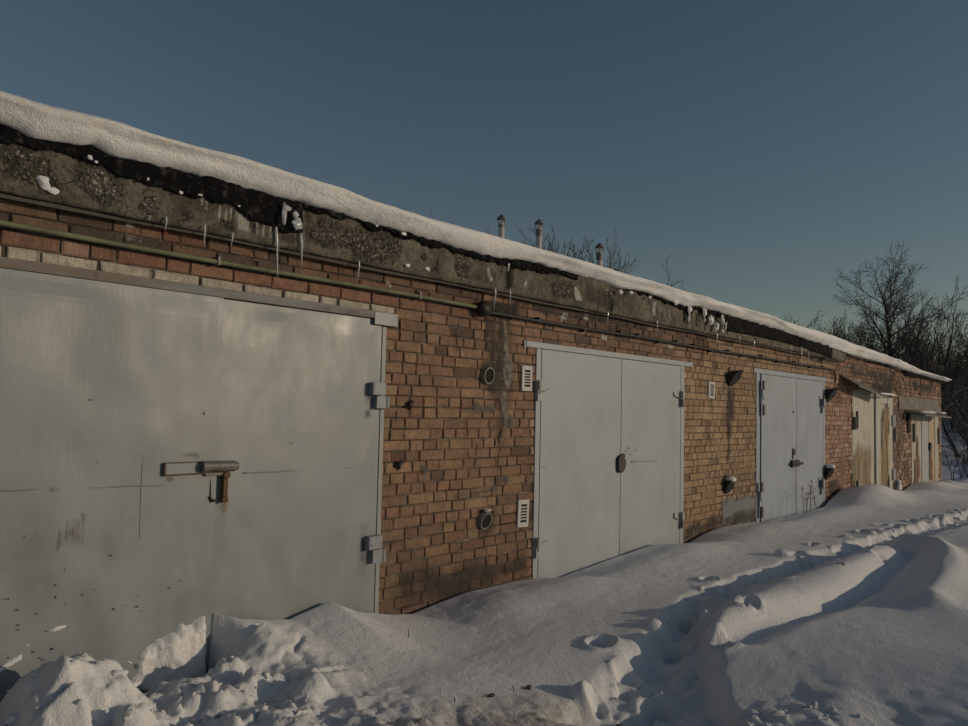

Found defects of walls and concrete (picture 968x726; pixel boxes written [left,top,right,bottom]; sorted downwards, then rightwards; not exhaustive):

water stain [486,268,527,406]
water stain [537,290,638,325]